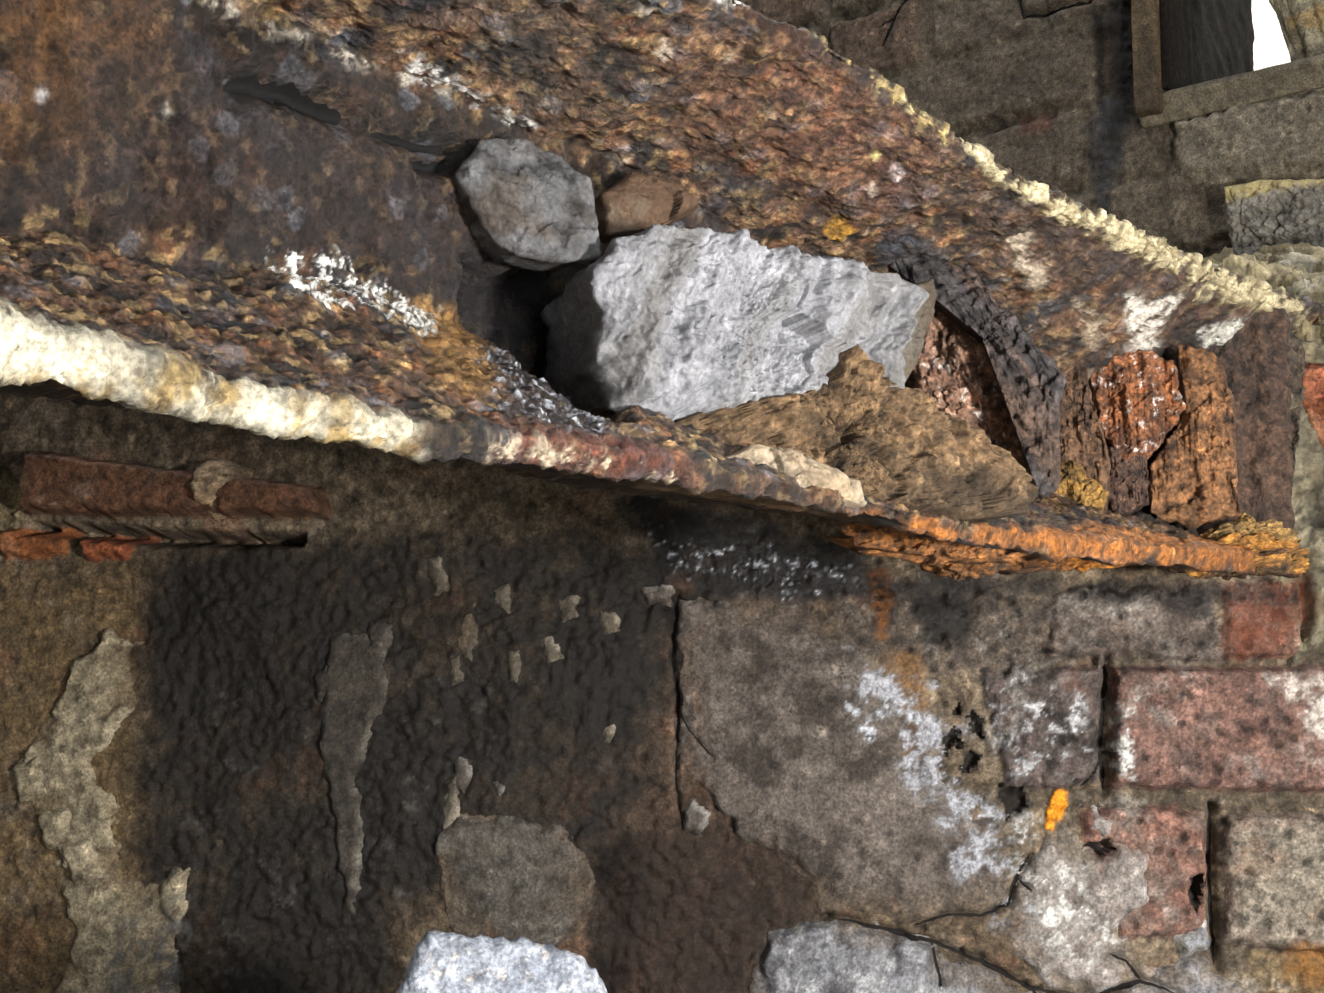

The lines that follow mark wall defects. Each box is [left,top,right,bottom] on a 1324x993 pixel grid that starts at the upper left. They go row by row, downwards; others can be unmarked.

crack [1018,0,1091,19]
damp [490,438,572,467]
corrosion [825,522,1139,635]
damp [1077,582,1301,613]
corrosion [1163,512,1310,581]
damp [111,495,1057,993]
crack [671,596,713,826]
crack [1080,661,1108,789]
damp [846,672,1116,966]
crack [827,854,1062,993]
crack [1100,953,1174,993]
crack [1193,802,1215,966]